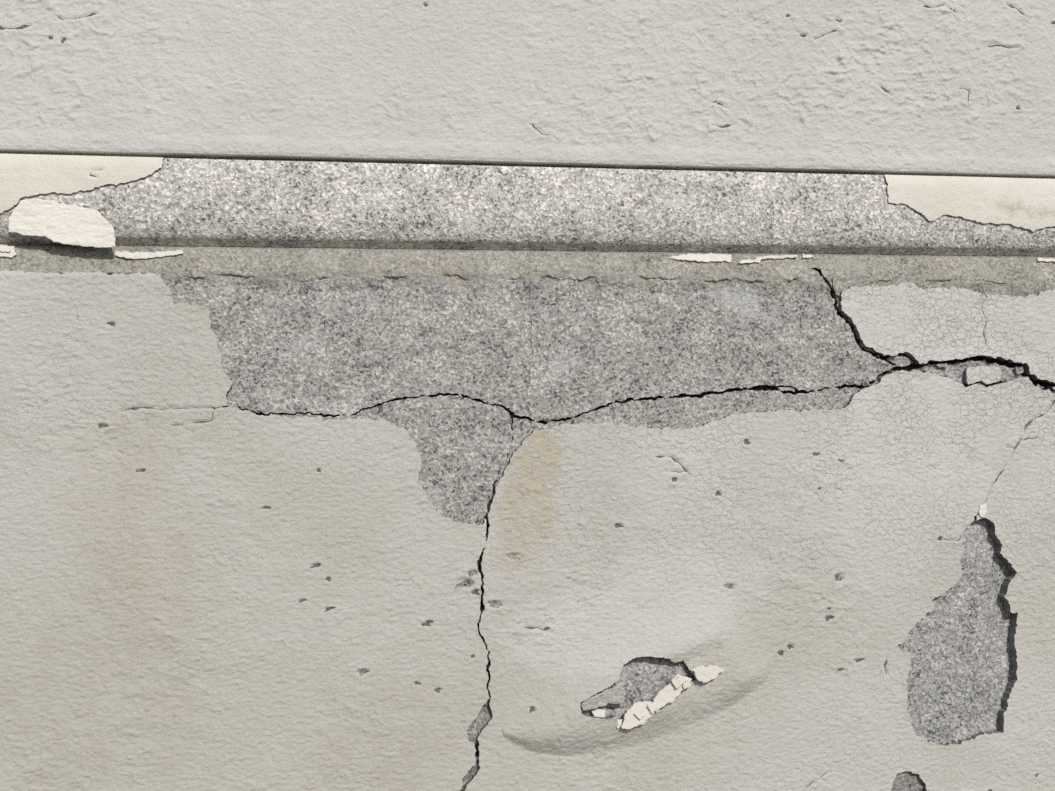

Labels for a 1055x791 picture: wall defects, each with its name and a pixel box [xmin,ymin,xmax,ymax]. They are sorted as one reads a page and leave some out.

spalling [0,157,1055,525]
crack [122,268,1055,791]
spalling [891,771,927,791]
spalling [898,504,1018,746]